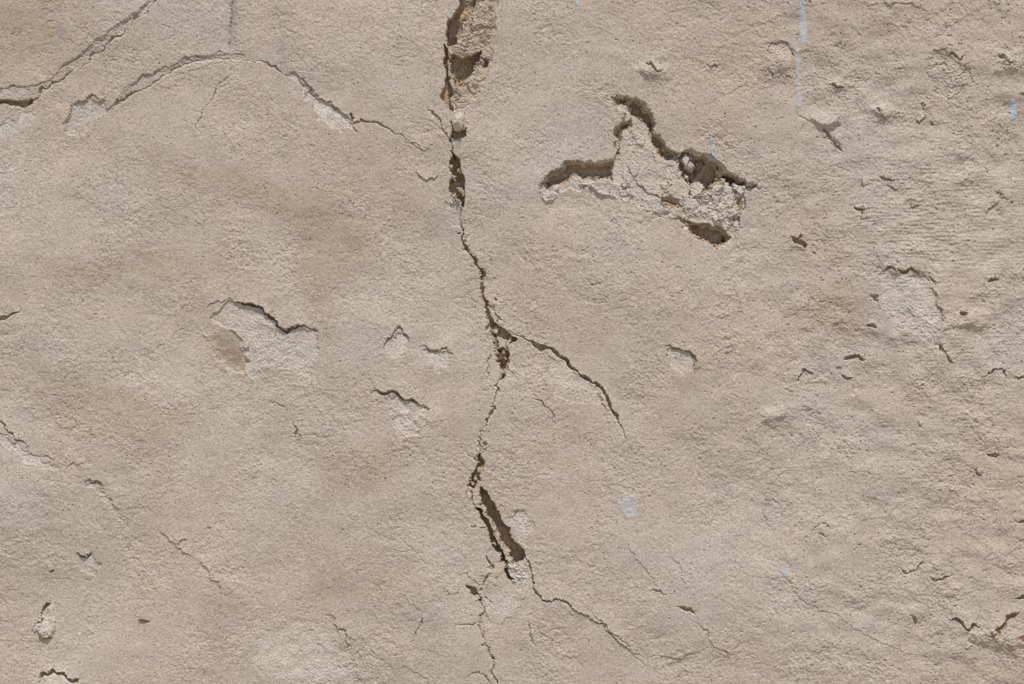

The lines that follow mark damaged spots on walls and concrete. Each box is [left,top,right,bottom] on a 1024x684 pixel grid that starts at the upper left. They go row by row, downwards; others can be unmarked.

crack [0,0,158,109]
flaking render [63,94,123,139]
crack [106,0,288,136]
spalling [538,95,762,250]
flaking render [201,298,320,383]
crack [349,0,738,684]
flaking render [31,598,57,639]
crack [900,561,1024,638]